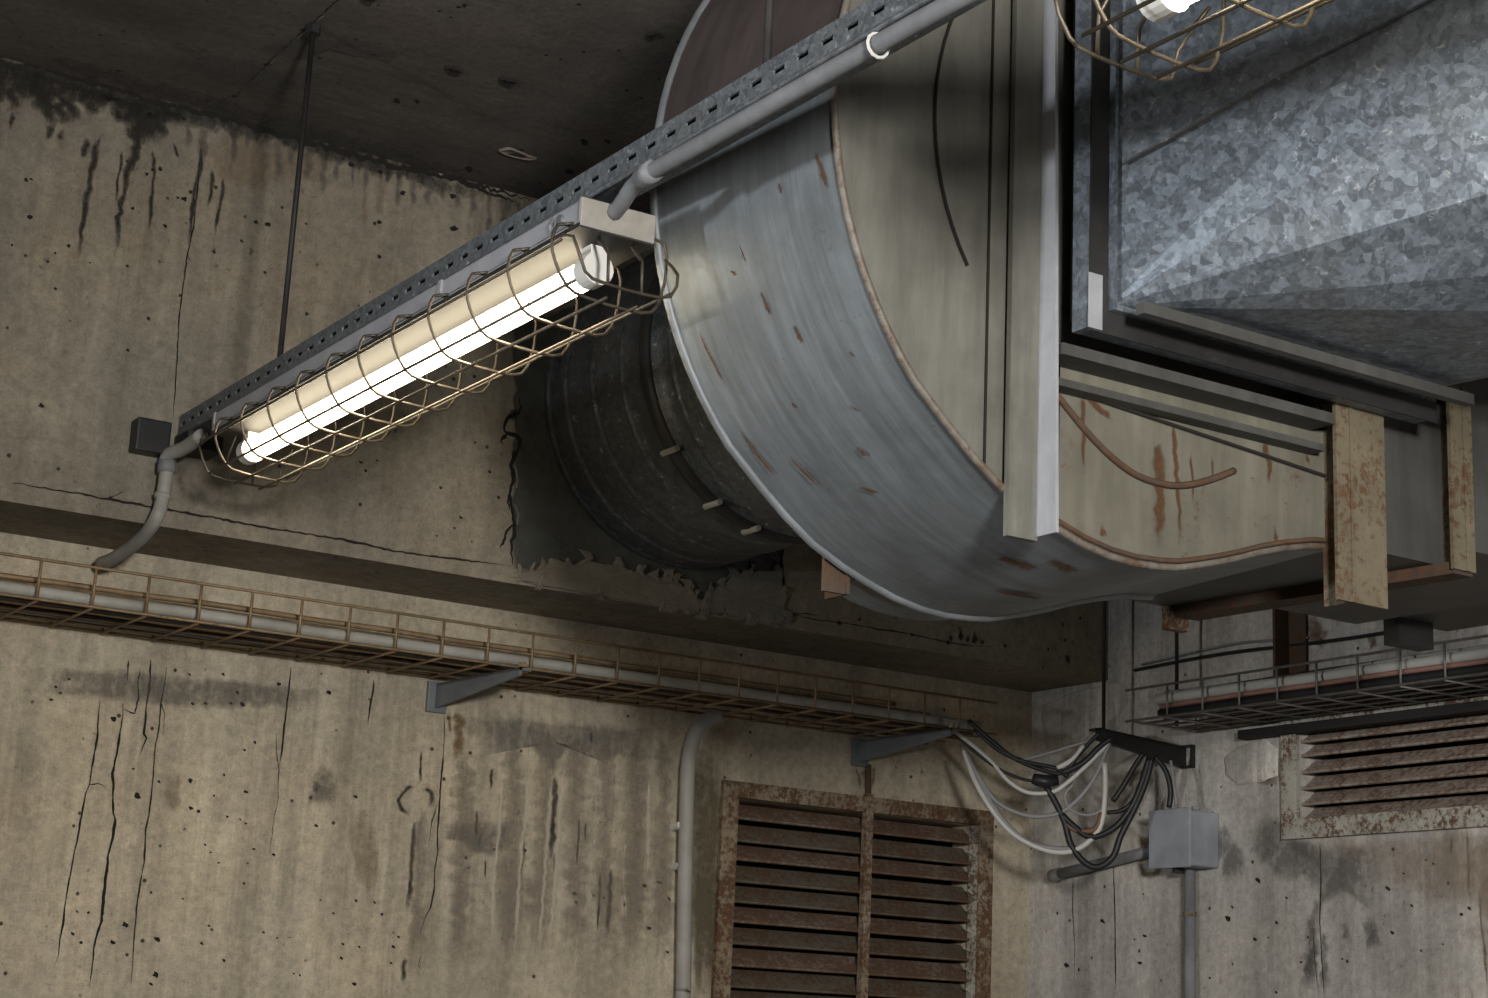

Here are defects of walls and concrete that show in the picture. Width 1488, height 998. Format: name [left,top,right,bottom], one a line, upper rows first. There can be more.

damp [0,59,181,245]
damp [189,149,224,233]
crack [24,0,530,416]
peeling [613,556,714,621]
damp [397,753,434,938]
damp [453,720,668,927]
damp [692,771,720,975]